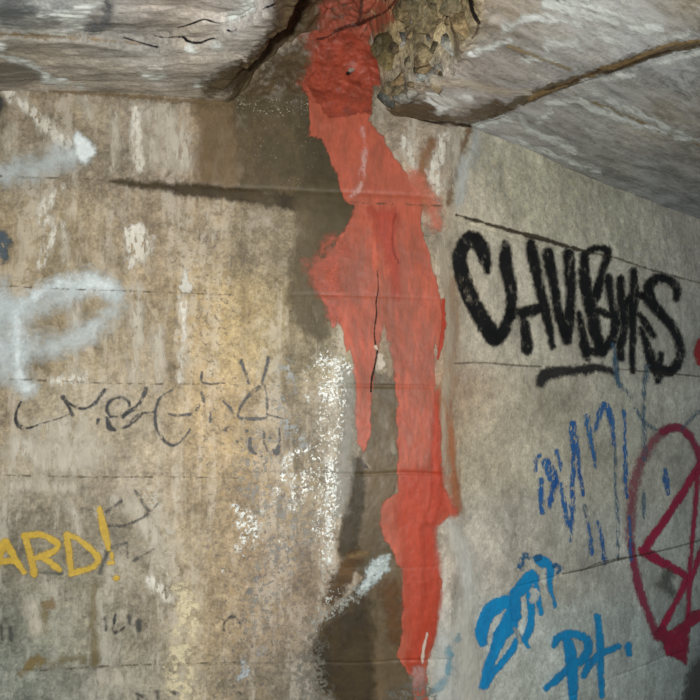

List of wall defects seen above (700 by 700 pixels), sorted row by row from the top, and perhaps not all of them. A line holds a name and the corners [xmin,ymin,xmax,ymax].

crack [124,15,245,48]
spalling [370,0,468,108]
crack [370,273,379,392]